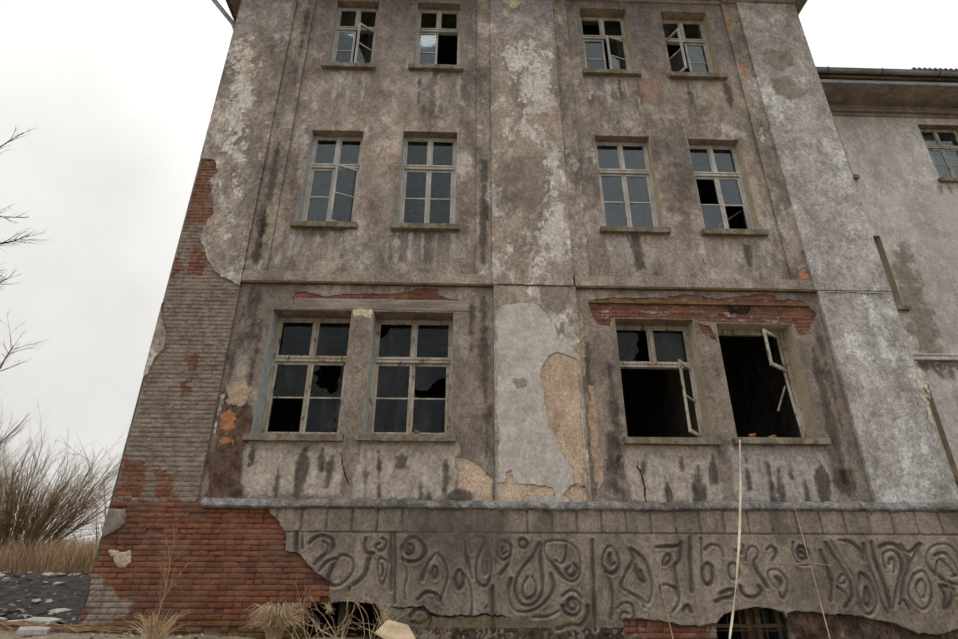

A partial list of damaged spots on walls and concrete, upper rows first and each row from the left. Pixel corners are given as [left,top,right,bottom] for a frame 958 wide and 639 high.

damp [479,160,488,264]
damp [499,157,553,209]
flaking render [79,25,331,639]
damp [205,291,473,527]
damp [469,296,492,423]
spalling [456,292,816,501]
damp [607,337,856,503]
crack [391,604,512,624]
spalling [623,618,717,639]